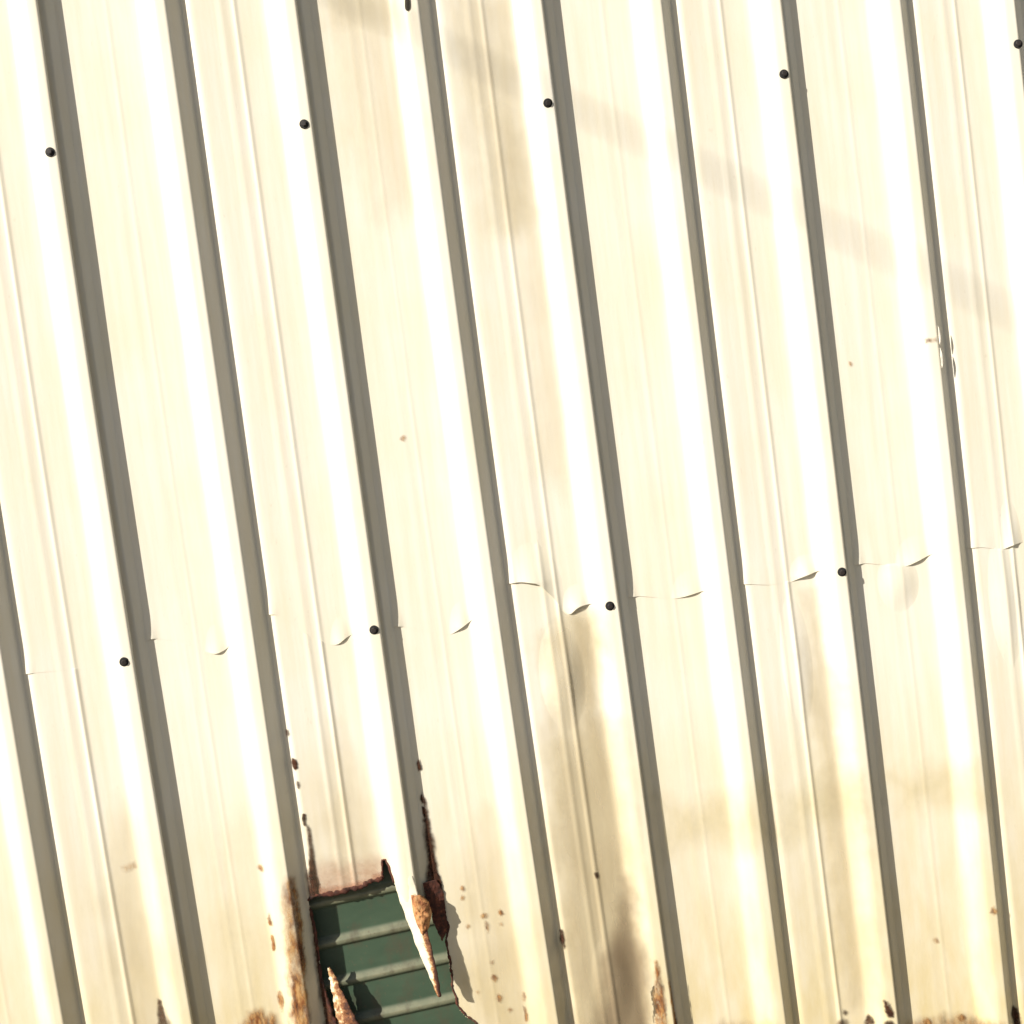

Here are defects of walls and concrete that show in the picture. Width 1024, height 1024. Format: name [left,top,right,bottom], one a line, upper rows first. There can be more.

corrosion [245,814,395,1024]
corrosion [411,794,478,1024]
corrosion [654,962,677,1024]
corrosion [865,1001,893,1024]